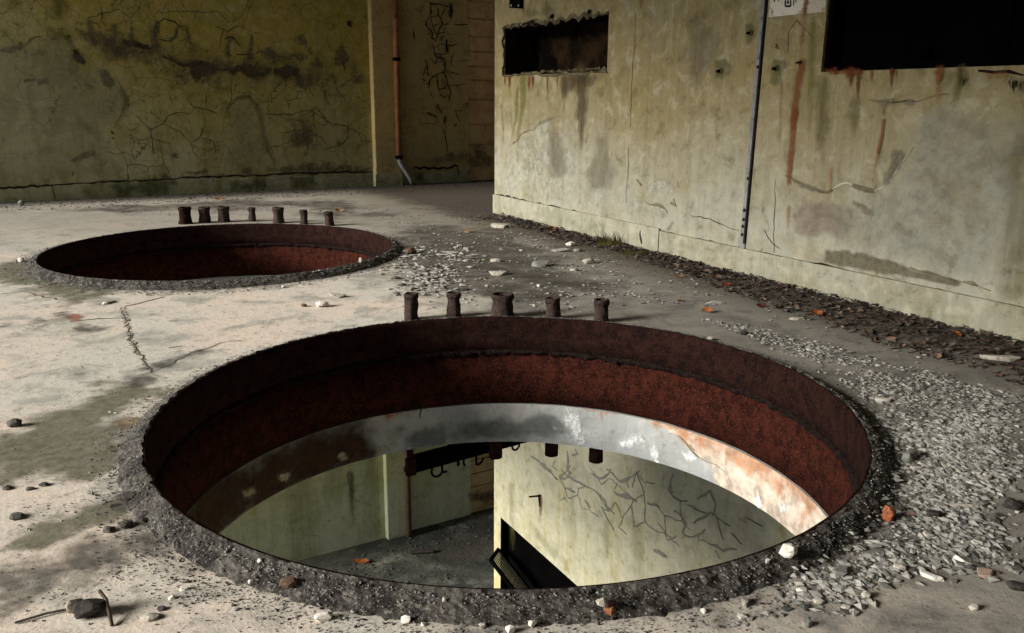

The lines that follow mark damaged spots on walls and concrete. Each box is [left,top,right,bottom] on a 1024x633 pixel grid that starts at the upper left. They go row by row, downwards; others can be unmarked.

crack [0,0,372,199]
crack [413,2,467,174]
leakage [499,67,595,194]
rust [787,61,805,183]
crack [4,291,241,373]
crack [531,449,763,559]
rust [734,454,764,475]